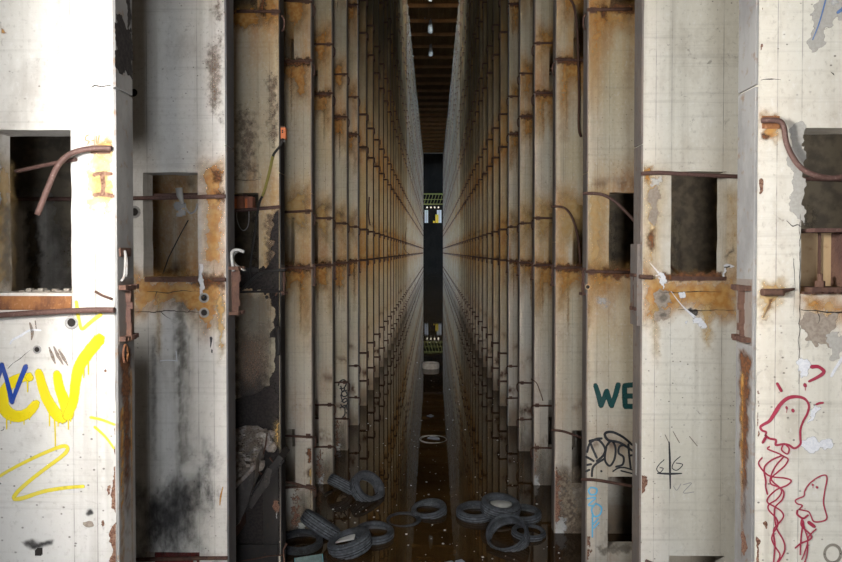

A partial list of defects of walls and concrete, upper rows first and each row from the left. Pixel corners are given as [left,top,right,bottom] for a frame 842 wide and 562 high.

peeling [806,0,842,53]
rust [510,57,583,152]
rust [203,163,225,264]
rust [561,197,602,260]
peeling [646,177,662,226]
peeling [787,121,807,227]
rust [134,273,225,348]
rust [510,259,582,303]
rust [644,270,737,338]
peeling [799,310,842,361]
rust [739,350,751,489]